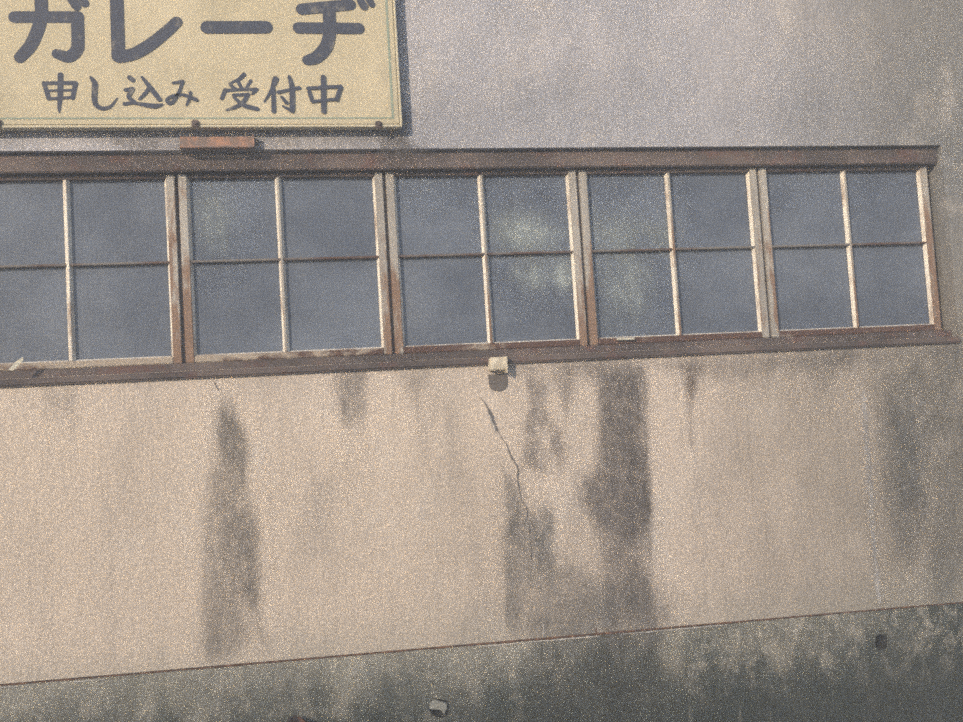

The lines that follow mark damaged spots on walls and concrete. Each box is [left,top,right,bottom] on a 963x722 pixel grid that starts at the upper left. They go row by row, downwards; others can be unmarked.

crack [480,398,532,562]
crack [0,530,963,688]